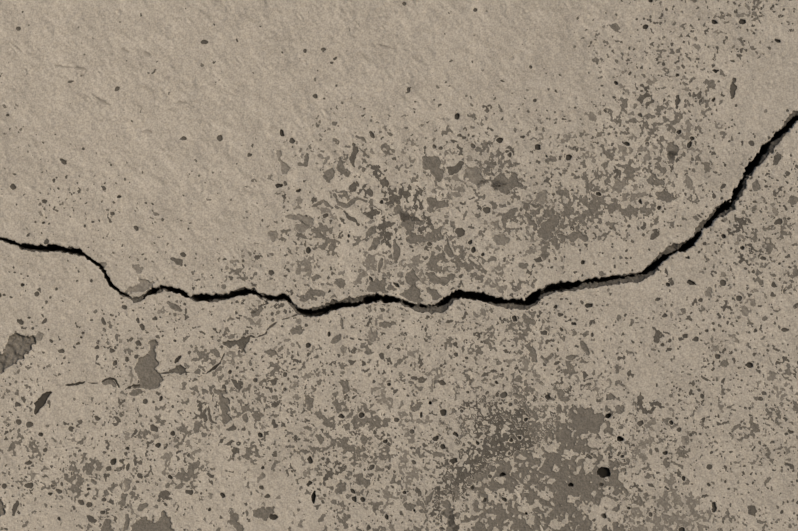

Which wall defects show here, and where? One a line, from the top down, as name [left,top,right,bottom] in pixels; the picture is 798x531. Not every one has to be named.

crack [0,111,798,374]
crack [65,377,140,390]